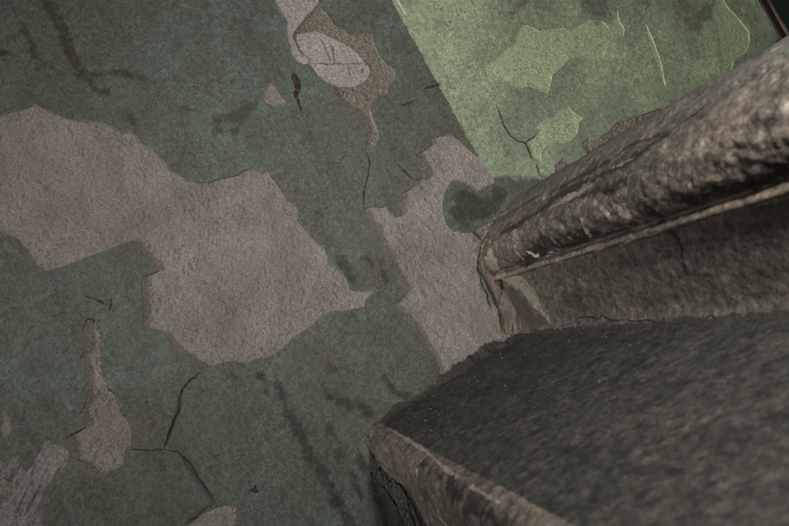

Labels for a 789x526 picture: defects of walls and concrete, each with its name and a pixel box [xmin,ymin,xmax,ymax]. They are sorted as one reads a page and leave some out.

spalling [260,82,286,107]
spalling [274,0,396,151]
peeling [484,10,625,95]
peeling [526,107,663,161]
peeling [645,22,667,87]
peeling [708,0,750,74]
spalling [0,103,374,370]
spalling [363,134,522,375]
spalling [0,317,133,526]
crack [132,374,217,505]
spalling [185,503,237,526]